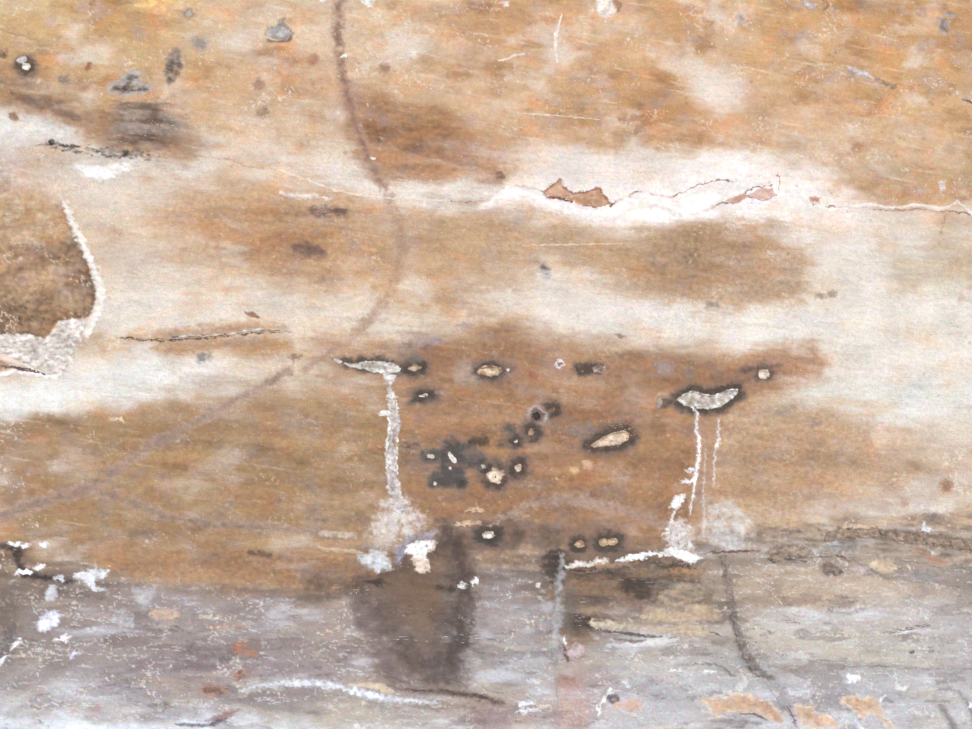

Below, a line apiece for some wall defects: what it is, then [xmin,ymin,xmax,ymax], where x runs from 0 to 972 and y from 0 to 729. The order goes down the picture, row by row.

crack [272,166,781,227]
spalling [543,177,614,208]
crack [808,194,972,236]
spalling [0,154,110,382]
water stain [0,0,492,549]
rust [0,52,836,559]
water stain [813,288,839,301]
crack [114,310,304,367]
water stain [246,549,274,559]
water stain [290,386,928,707]
water stain [0,539,80,665]